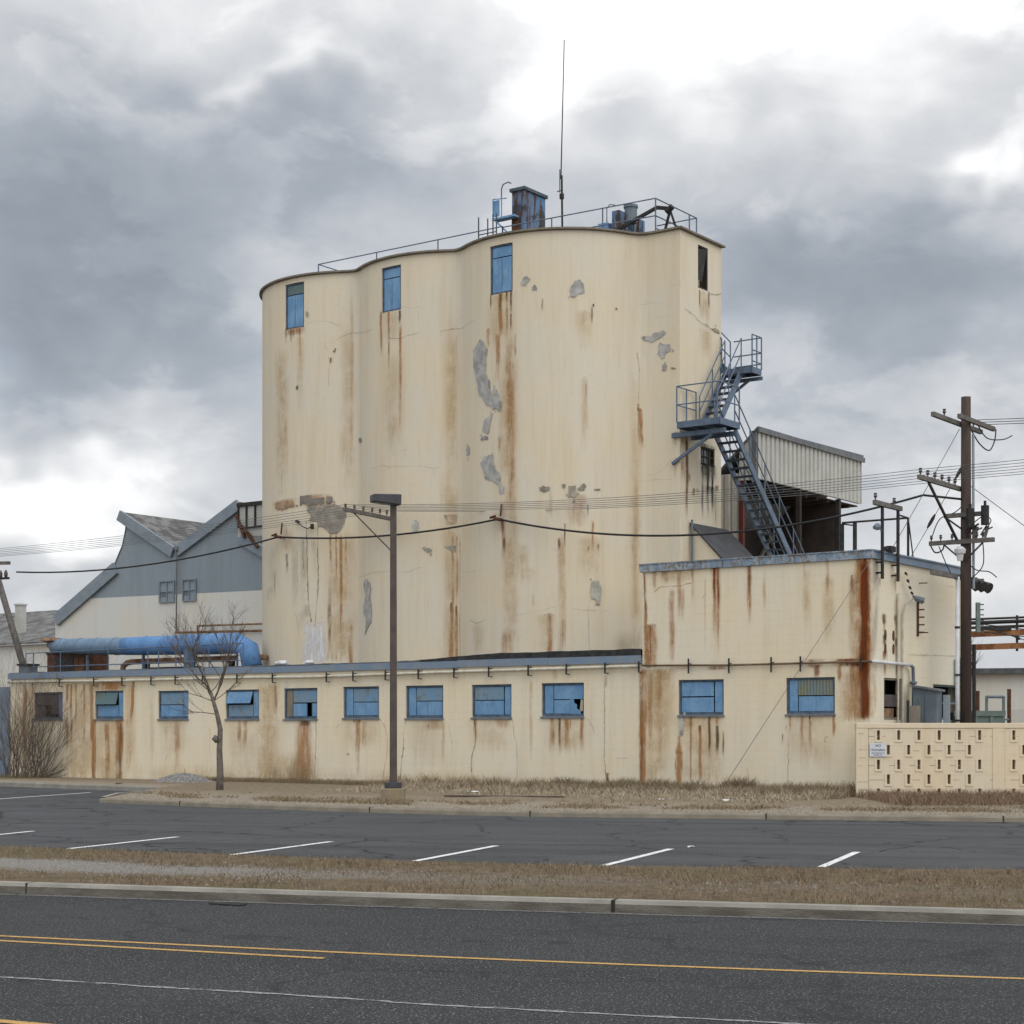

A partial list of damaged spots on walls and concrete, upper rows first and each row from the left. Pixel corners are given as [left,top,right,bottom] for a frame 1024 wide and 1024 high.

spalling [569,279,585,298]
rust [380,311,401,383]
rust [487,291,512,362]
spalling [642,330,676,371]
spalling [473,339,501,440]
spalling [466,445,503,494]
spalling [274,495,346,534]
spalling [363,579,372,634]
rust [640,575,655,680]
rust [838,559,897,718]
rust [66,682,134,779]
rust [676,717,724,783]